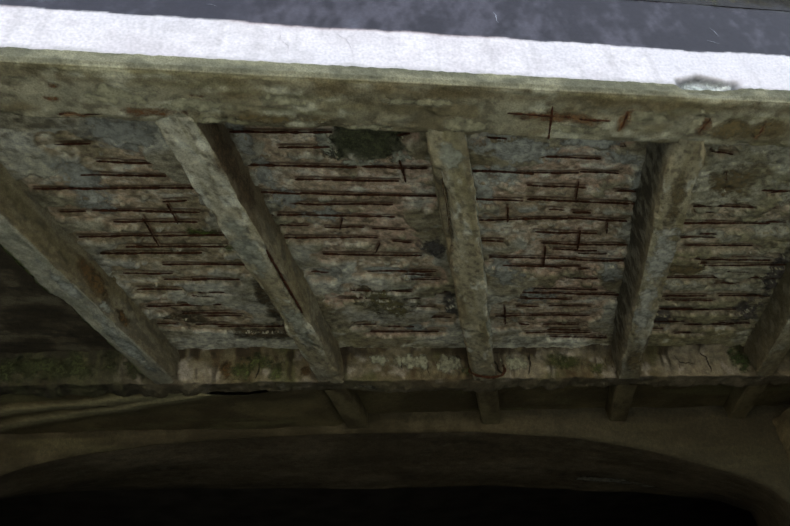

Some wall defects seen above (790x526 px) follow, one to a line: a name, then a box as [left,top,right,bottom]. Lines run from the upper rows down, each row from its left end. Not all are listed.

spalling [20,130,285,333]
spalling [229,125,459,338]
spalling [470,106,637,341]
spalling [652,189,790,337]